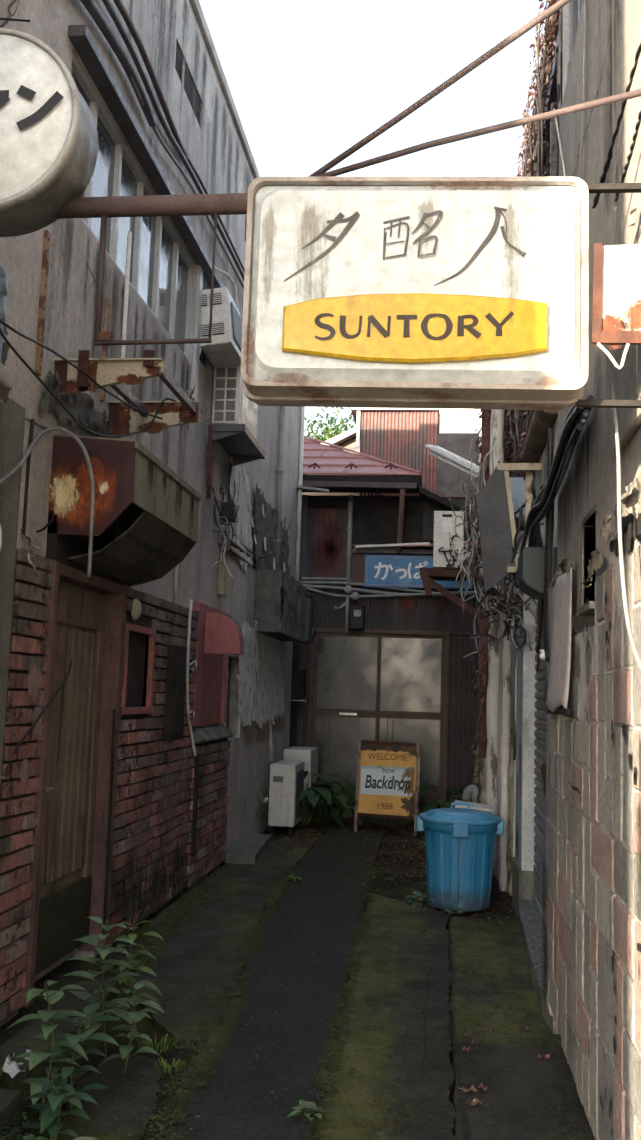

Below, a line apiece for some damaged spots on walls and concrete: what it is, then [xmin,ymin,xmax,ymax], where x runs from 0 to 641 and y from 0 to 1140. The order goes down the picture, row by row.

rust [55,361,98,393]
rust [116,363,161,385]
rust [108,403,199,436]
rust [49,457,121,533]
spalling [546,472,641,653]
peeling [237,619,286,729]